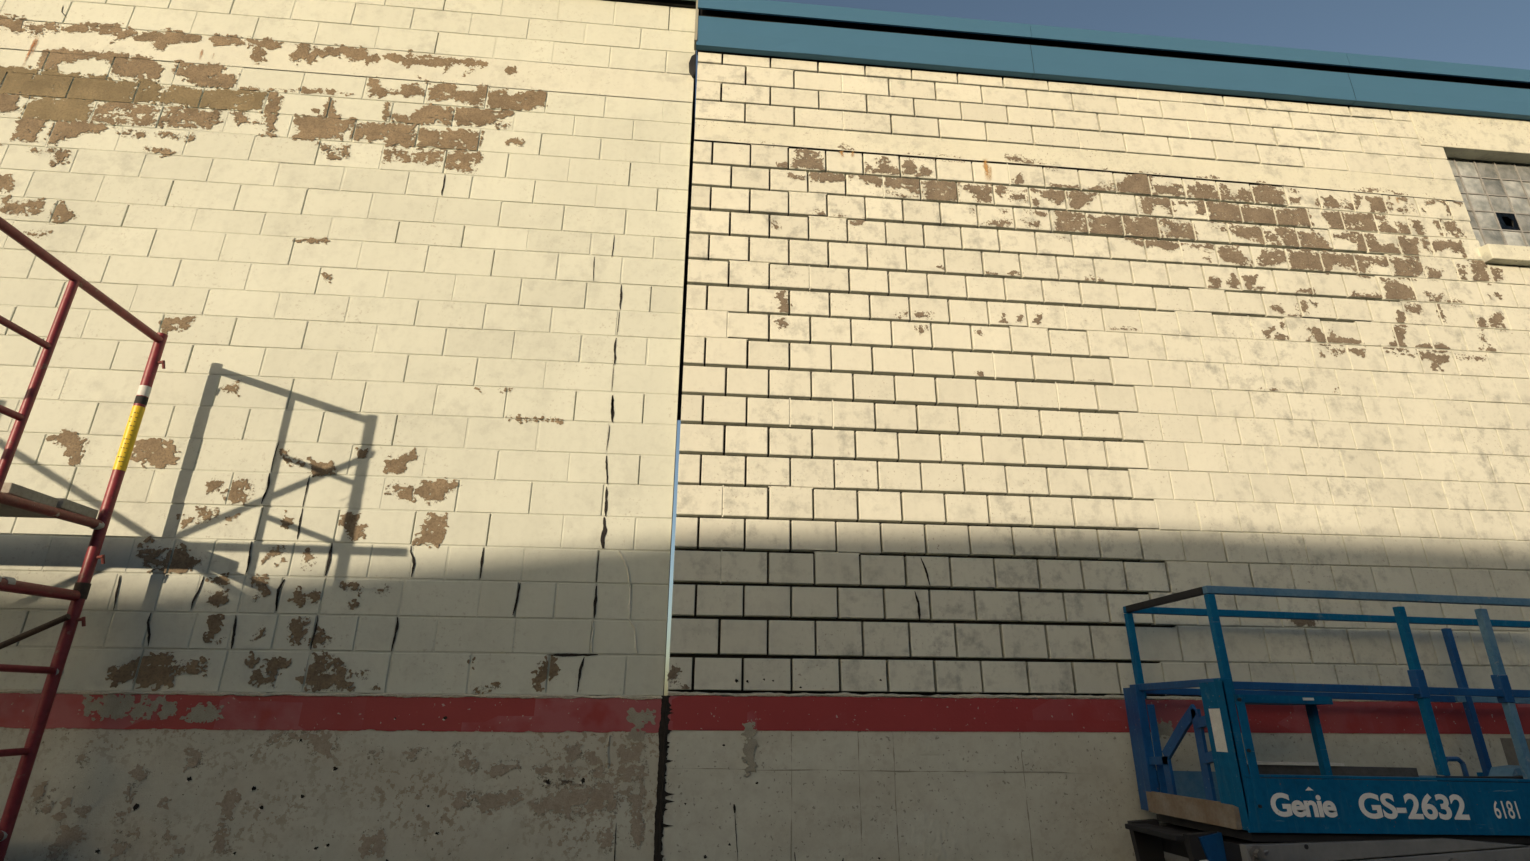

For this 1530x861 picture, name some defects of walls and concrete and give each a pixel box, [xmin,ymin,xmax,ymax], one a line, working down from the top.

peeling [0,13,548,173]
peeling [130,438,181,468]
peeling [82,479,254,724]
crack [245,541,285,611]
crack [261,443,279,504]
peeling [279,448,336,477]
peeling [244,510,381,692]
crack [297,479,333,576]
peeling [355,447,458,548]
crack [408,548,416,577]
crack [478,548,486,578]
crack [552,240,638,692]